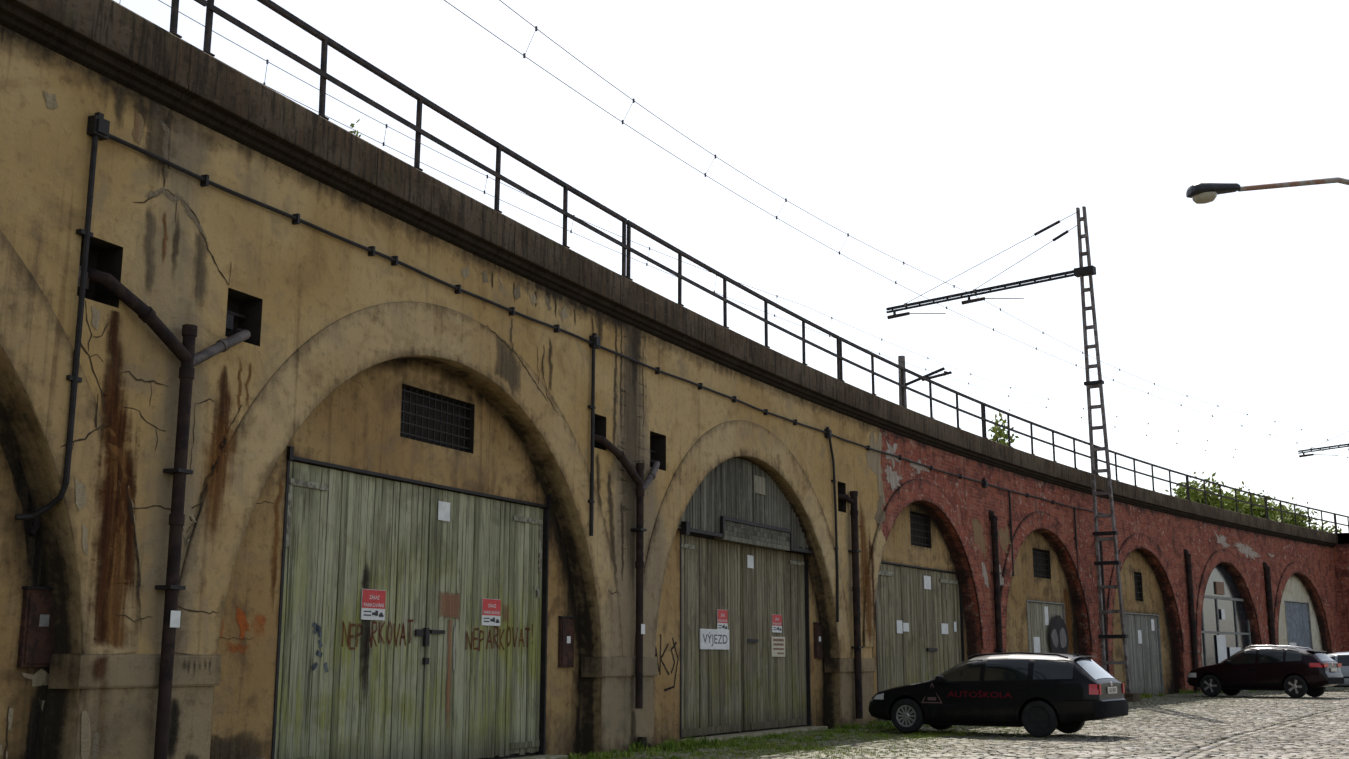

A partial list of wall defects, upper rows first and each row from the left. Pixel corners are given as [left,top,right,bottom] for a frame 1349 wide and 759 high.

water stain [146,213,179,288]
crack [134,107,231,285]
water stain [195,237,206,300]
corrosion [94,311,136,677]
crack [61,307,252,640]
corrosion [207,364,251,529]
spalling [866,432,930,529]
water stain [168,700,261,759]